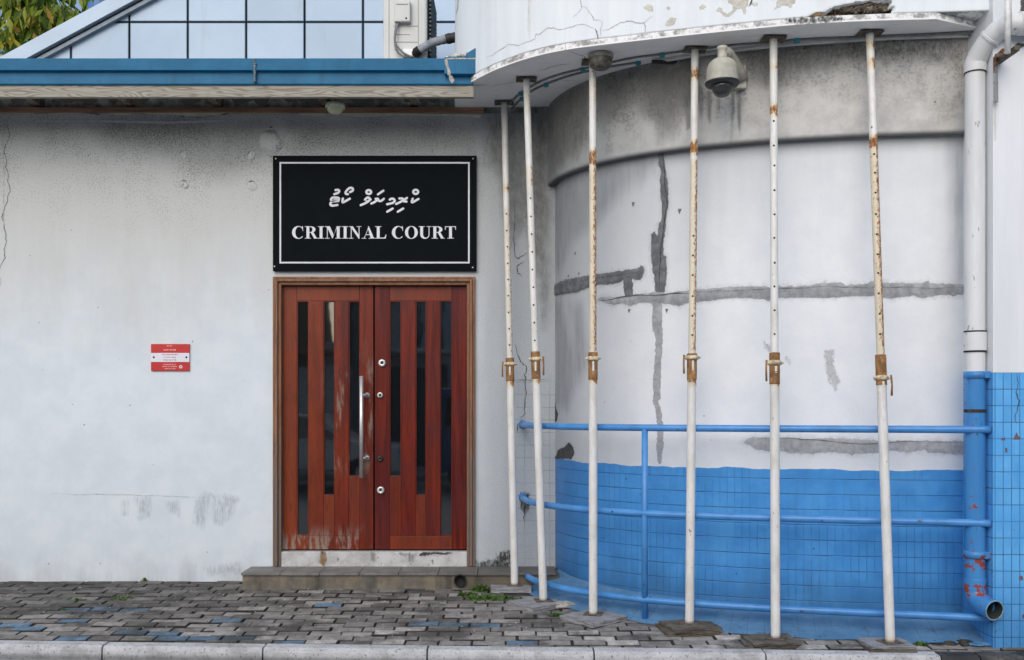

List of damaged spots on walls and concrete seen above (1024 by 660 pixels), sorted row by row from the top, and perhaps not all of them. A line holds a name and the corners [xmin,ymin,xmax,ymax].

crack [488,0,651,57]
peeling [699,0,758,17]
spalling [776,0,892,24]
crack [0,116,10,267]
crack [514,344,548,430]
peeling [555,442,574,459]